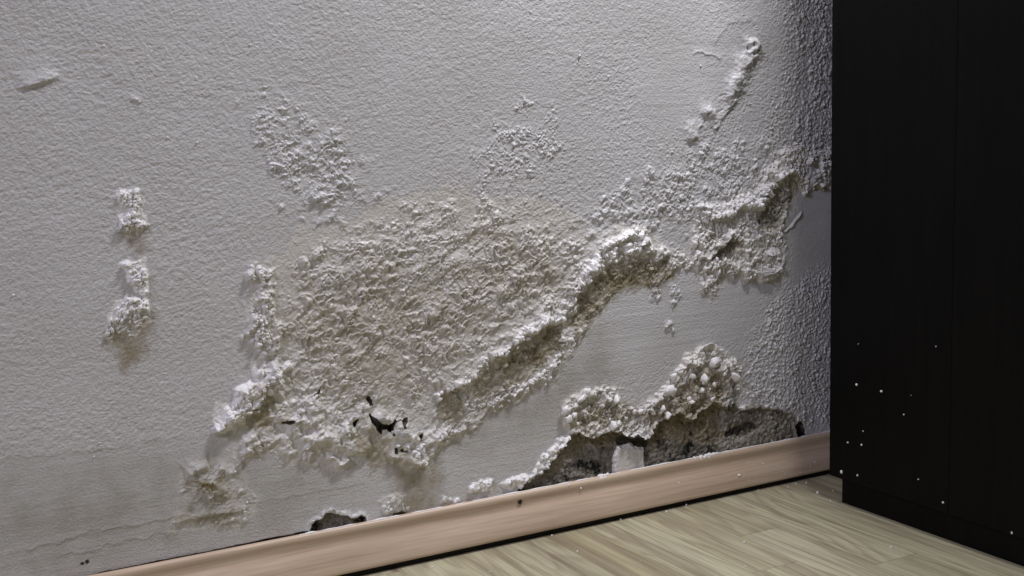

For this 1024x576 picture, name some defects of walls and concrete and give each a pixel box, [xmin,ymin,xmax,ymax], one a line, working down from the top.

peeling [423,142,831,451]
flaking render [517,403,805,491]
flaking render [309,509,366,531]